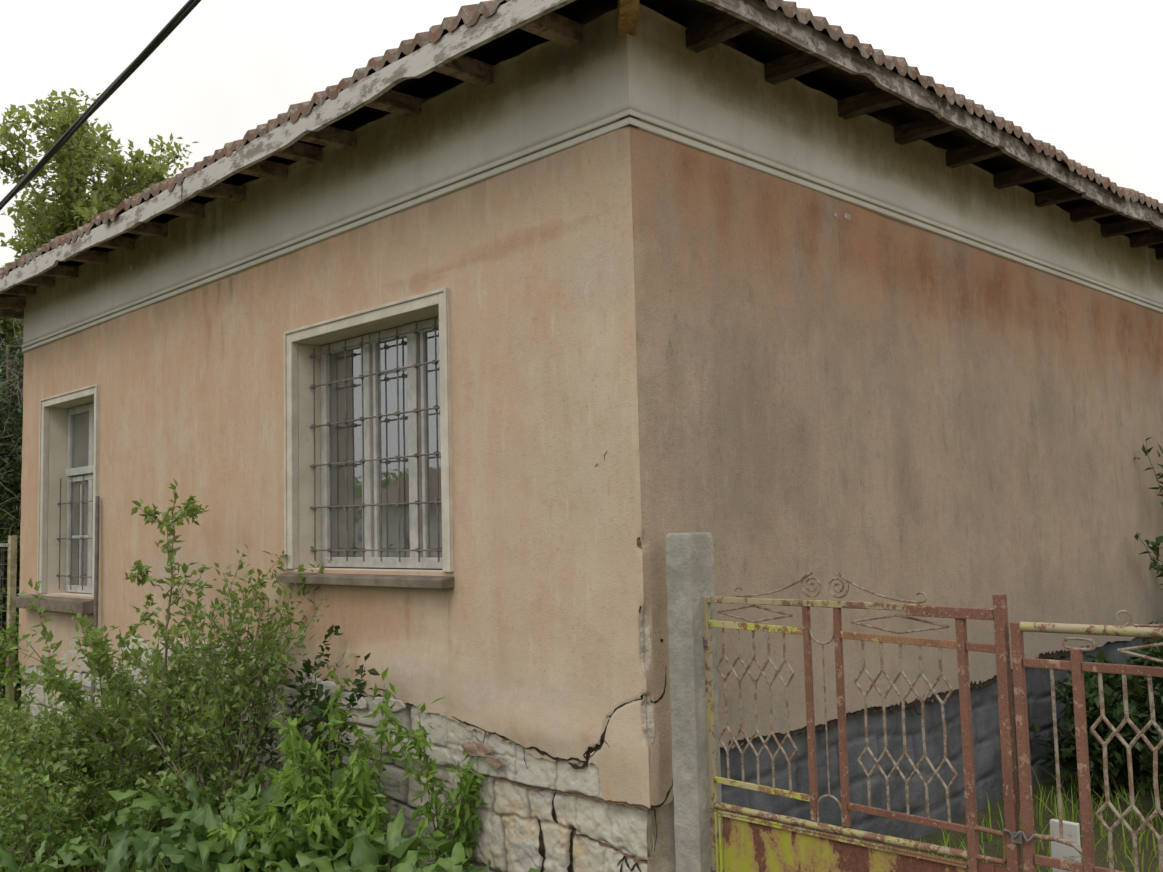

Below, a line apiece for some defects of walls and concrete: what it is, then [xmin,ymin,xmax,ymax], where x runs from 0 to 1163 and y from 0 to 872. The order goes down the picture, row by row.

crack [452,675,673,872]